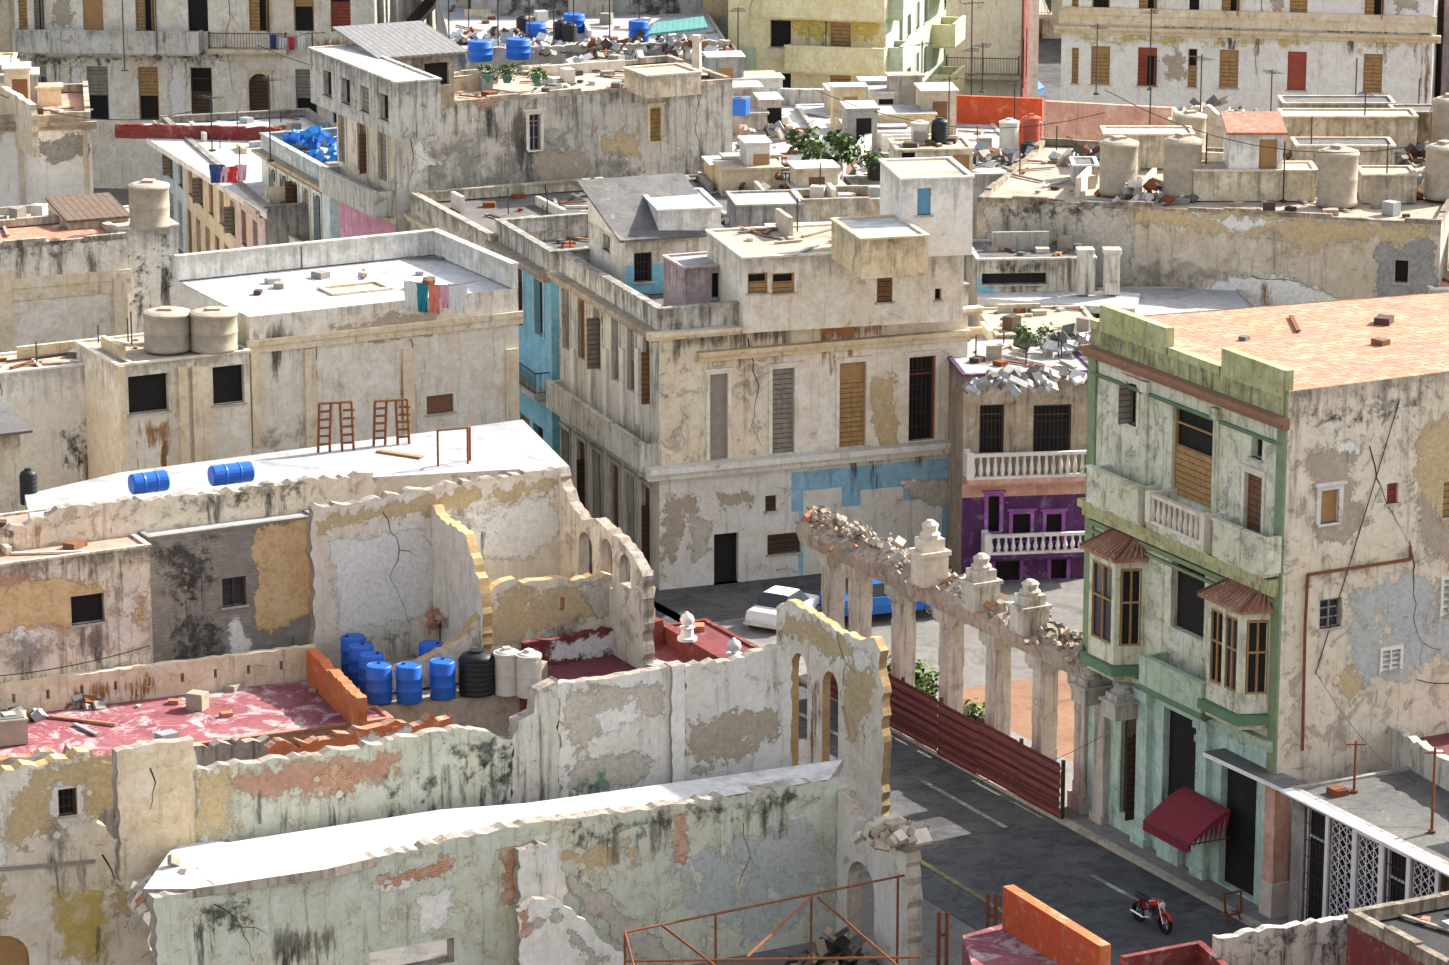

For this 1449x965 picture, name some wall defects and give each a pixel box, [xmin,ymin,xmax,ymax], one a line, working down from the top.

spalling [0,570,110,634]
peeling [227,473,560,654]
crack [383,512,416,624]
peeling [659,491,754,582]
peeling [1332,569,1449,707]
peeling [559,681,666,791]
peeling [685,706,782,776]
peeling [0,751,114,934]
leakage [740,791,797,832]
leakage [199,894,253,953]
leakage [275,931,329,965]
peeling [496,835,679,965]